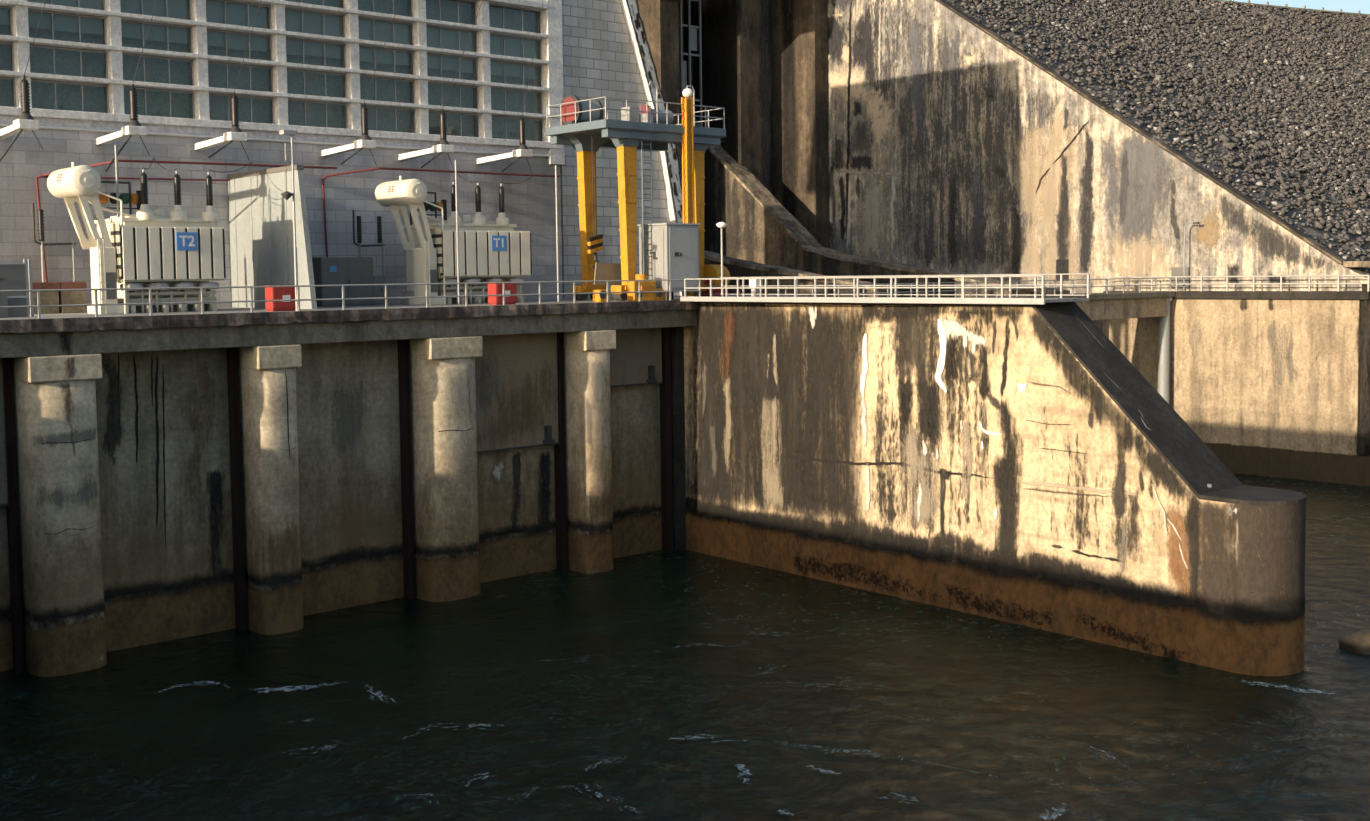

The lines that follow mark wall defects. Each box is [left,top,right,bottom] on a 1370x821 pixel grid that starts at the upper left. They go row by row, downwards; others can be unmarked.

leakage [827,0,1179,274]
crack [1035,121,1089,194]
leakage [1221,197,1332,310]
leakage [60,332,76,421]
leakage [1205,300,1370,487]
leakage [0,353,662,677]
leakage [685,303,1335,694]
leakage [258,682,336,693]